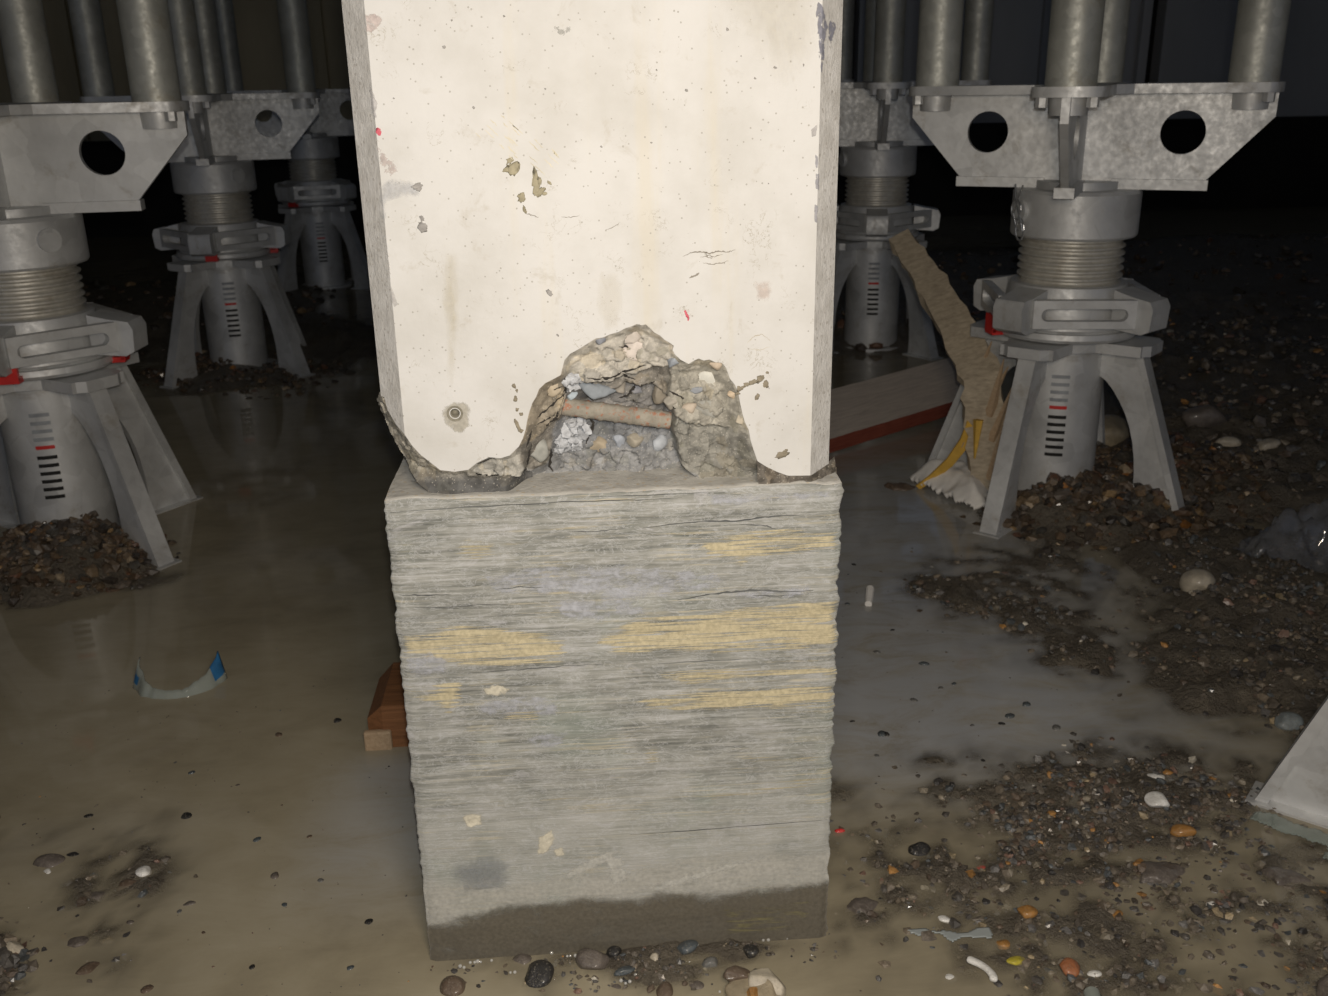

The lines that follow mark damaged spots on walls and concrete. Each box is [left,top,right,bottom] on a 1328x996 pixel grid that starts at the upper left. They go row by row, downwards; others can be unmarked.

spalling [377,324,757,494]
damp [538,831,564,856]
damp [426,851,830,961]